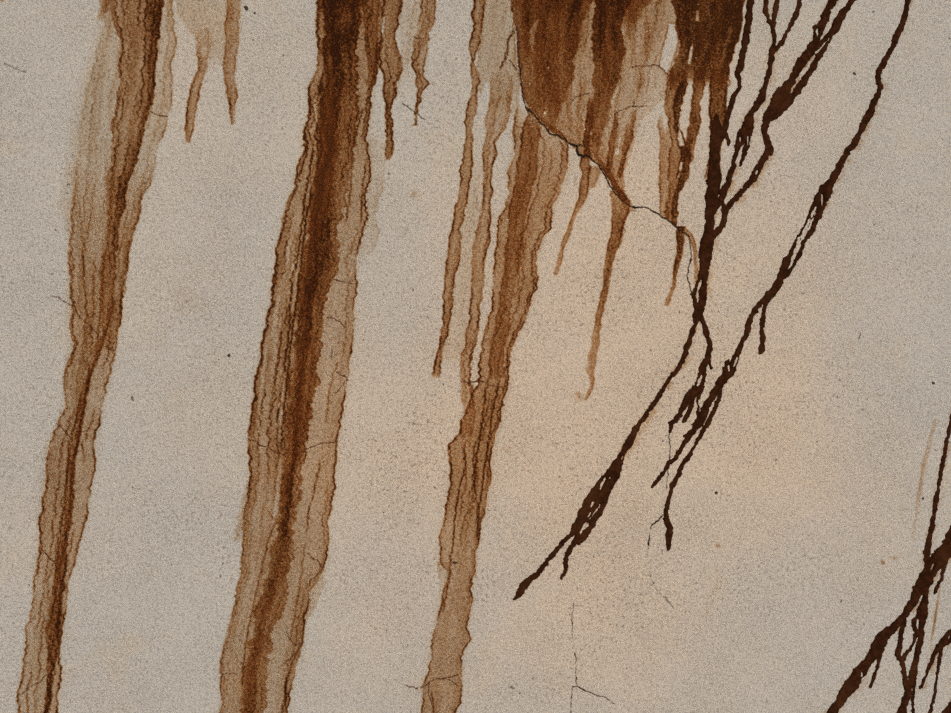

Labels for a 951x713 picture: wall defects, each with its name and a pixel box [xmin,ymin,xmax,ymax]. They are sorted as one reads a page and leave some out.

rust [464,0,485,127]
rust [507,0,643,319]
crack [500,26,696,292]
rust [659,0,745,279]
rust [32,0,164,713]
rust [242,0,429,713]
rust [433,112,560,617]